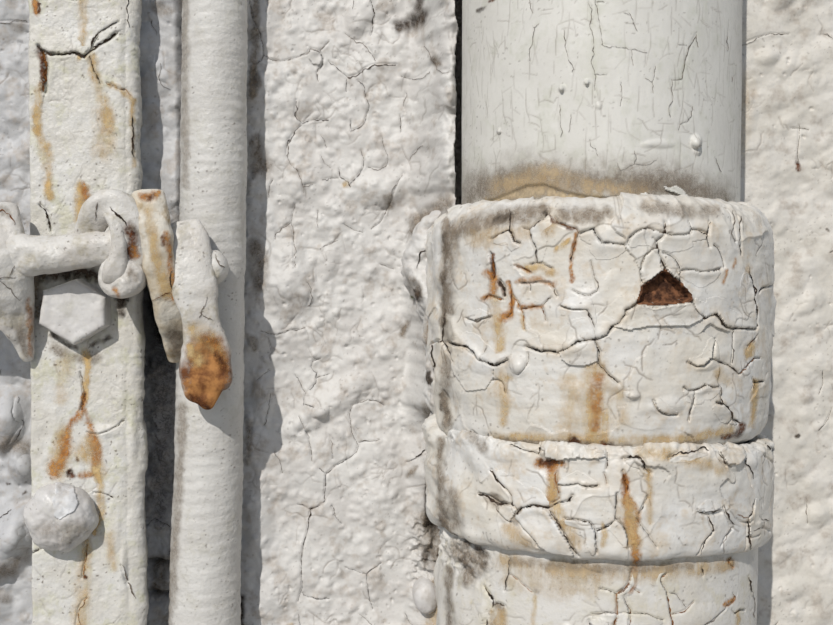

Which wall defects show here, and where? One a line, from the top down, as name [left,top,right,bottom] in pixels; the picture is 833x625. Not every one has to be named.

rust [38,48,46,90]
crack [249,1,442,130]
rust [150,233,174,300]
rust [483,253,554,352]
crack [430,209,773,425]
spalling [614,249,703,330]
rust [168,325,233,410]
rust [49,351,102,498]
crack [478,452,656,556]
rust [622,474,641,573]
crack [669,446,768,574]
crack [484,560,532,625]